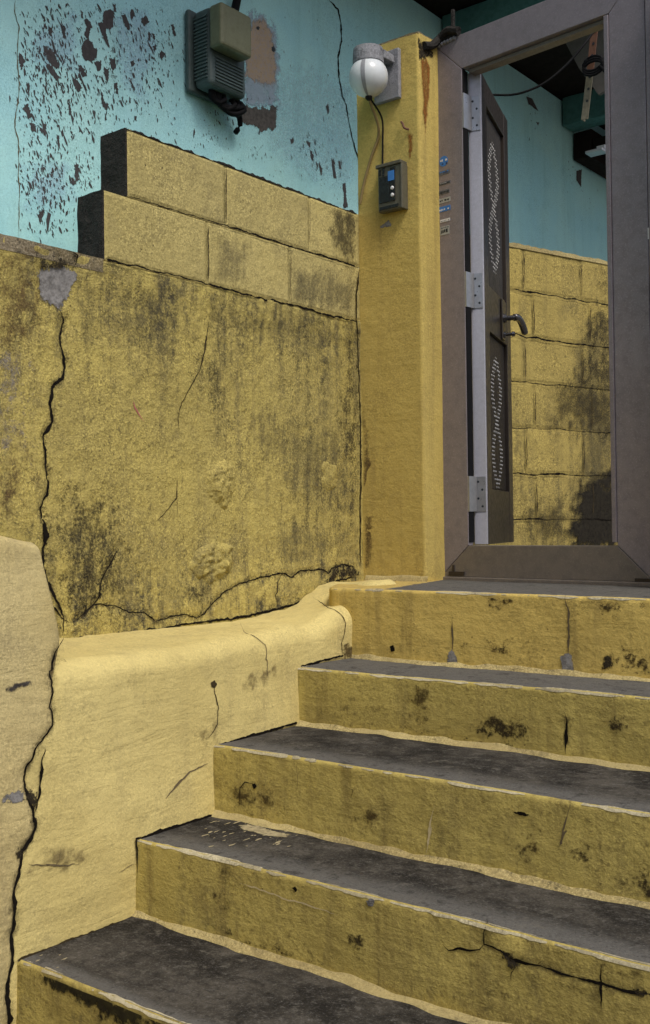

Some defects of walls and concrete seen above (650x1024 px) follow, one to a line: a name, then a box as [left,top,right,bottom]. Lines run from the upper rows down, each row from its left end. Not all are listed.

peeling [9,0,186,244]
peeling [193,11,291,162]
peeling [290,131,348,208]
crack [329,0,358,157]
rust [421,58,430,128]
water stain [340,331,371,485]
water stain [550,312,610,437]
water stain [50,485,130,612]
crack [5,168,362,1024]
crack [560,595,574,670]
water stain [522,470,618,546]
crack [443,927,650,1016]